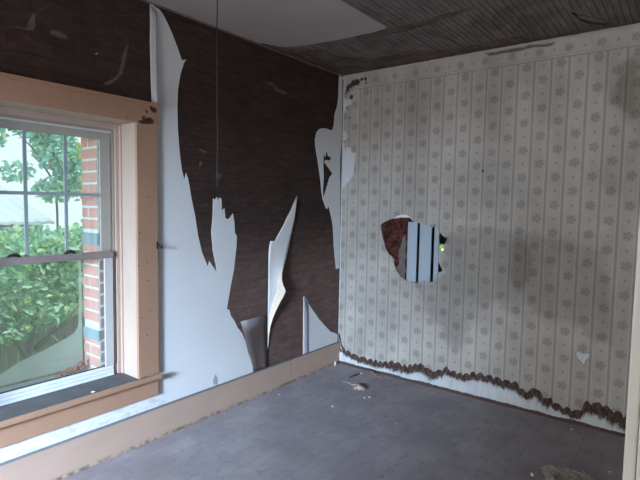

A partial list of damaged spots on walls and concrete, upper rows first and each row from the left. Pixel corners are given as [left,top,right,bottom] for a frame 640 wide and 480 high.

flaking render [0,0,640,367]